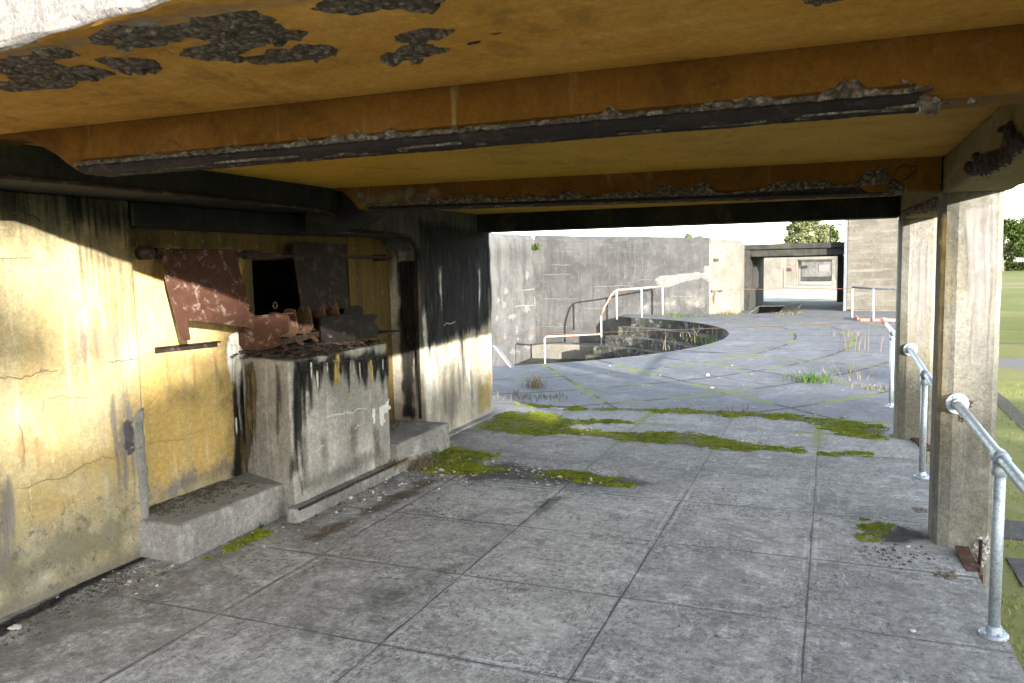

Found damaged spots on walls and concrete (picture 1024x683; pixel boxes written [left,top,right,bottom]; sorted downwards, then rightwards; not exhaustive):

spalling [0,10,337,92]
spalling [73,77,953,177]
spalling [366,166,909,212]
spalling [963,120,1024,177]
crack [0,366,87,412]
crack [15,424,121,525]
leakage [111,402,135,488]
leakage [220,331,257,477]
leakage [290,221,492,477]